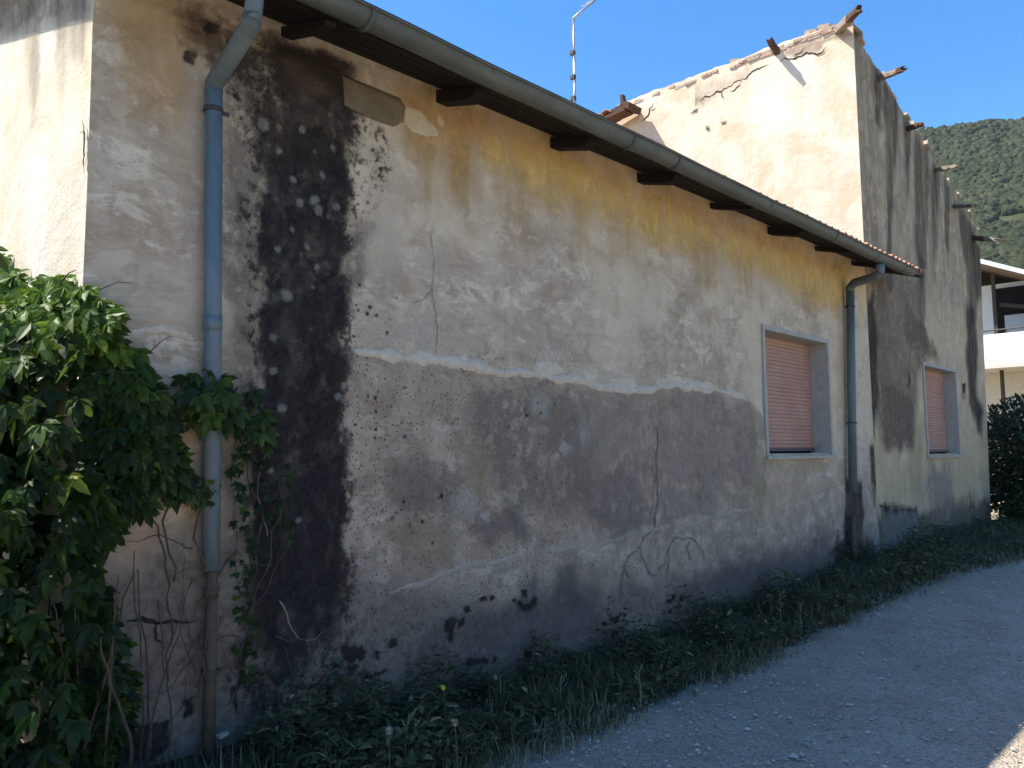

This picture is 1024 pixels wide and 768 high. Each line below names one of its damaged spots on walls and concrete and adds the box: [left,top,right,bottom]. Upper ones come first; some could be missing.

flaking render [403,105,445,138]
crack [703,47,826,98]
damp [223,33,391,726]
crack [413,232,438,355]
damp [836,70,983,565]
damp [473,392,757,532]
crack [621,428,706,604]